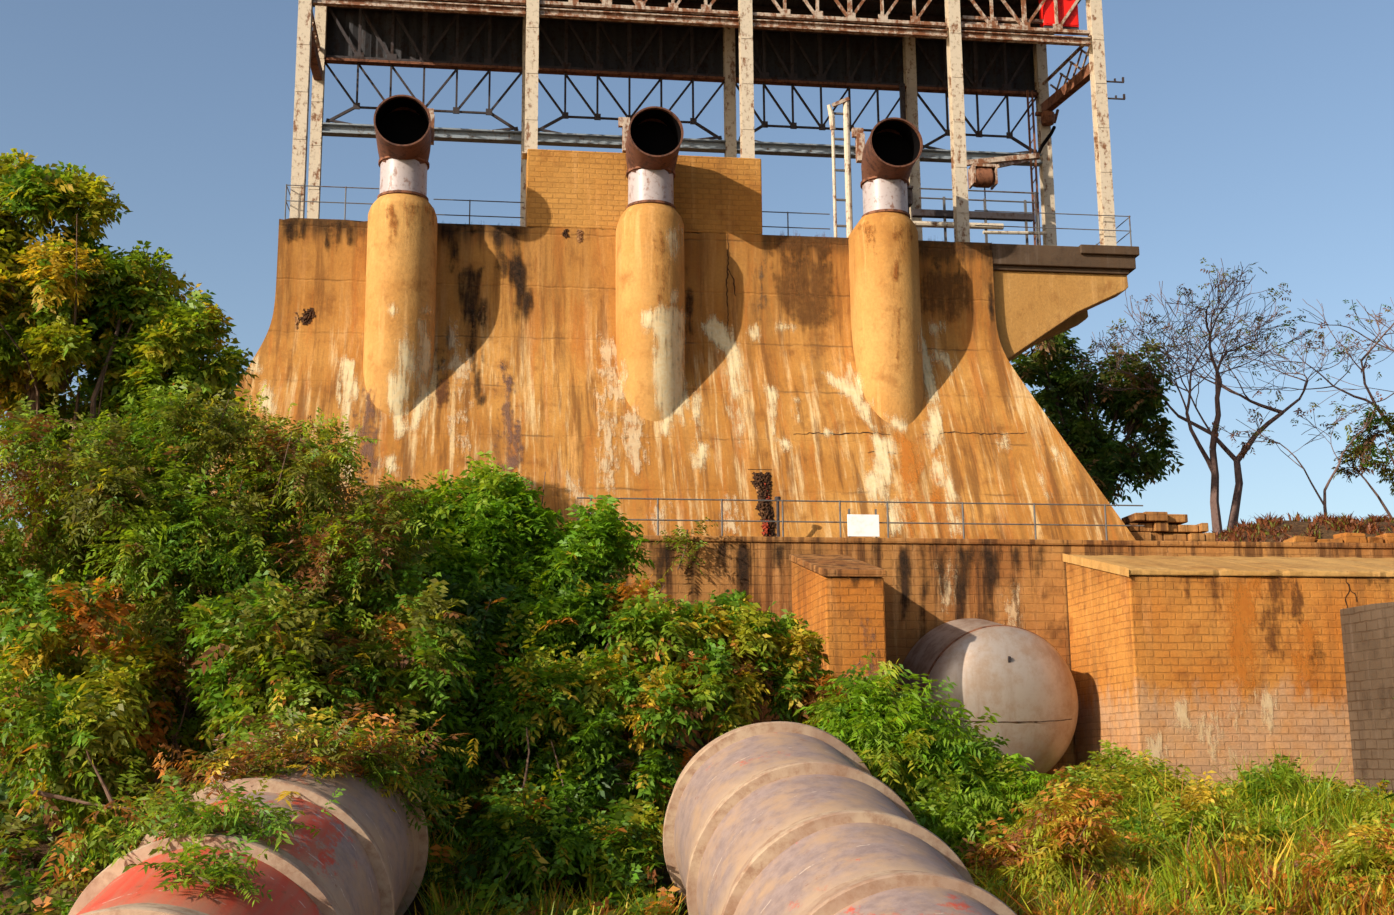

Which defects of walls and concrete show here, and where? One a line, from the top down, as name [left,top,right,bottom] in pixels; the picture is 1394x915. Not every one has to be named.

damp [286,221,306,239]
damp [325,223,352,247]
damp [759,236,834,330]
damp [336,225,533,481]
damp [595,335,645,490]
damp [641,293,759,468]
damp [767,386,789,450]
damp [827,364,907,534]
damp [896,243,1020,629]
damp [650,502,699,598]
damp [716,496,751,601]
damp [1261,576,1303,659]